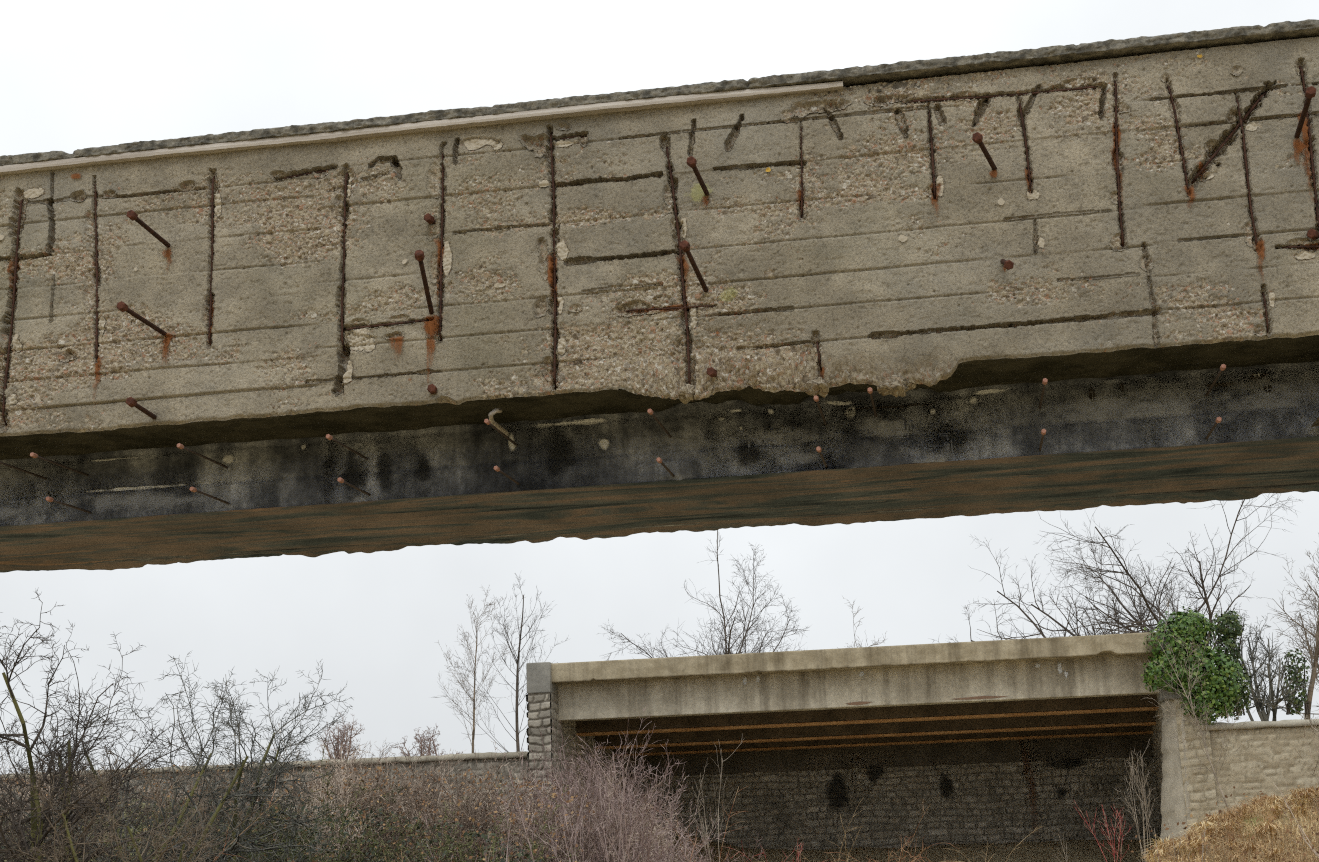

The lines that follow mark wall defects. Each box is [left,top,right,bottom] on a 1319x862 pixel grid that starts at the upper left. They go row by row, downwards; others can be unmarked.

peeling [1205,138,1220,160]
rust [1293,114,1310,185]
spalling [175,180,196,193]
peeling [533,237,549,318]
rust [425,319,440,372]
spalling [624,337,958,404]
leakage [1223,380,1319,410]
leakage [325,453,392,494]
leakage [536,418,605,473]
leakage [737,427,761,464]
leakage [781,453,816,465]